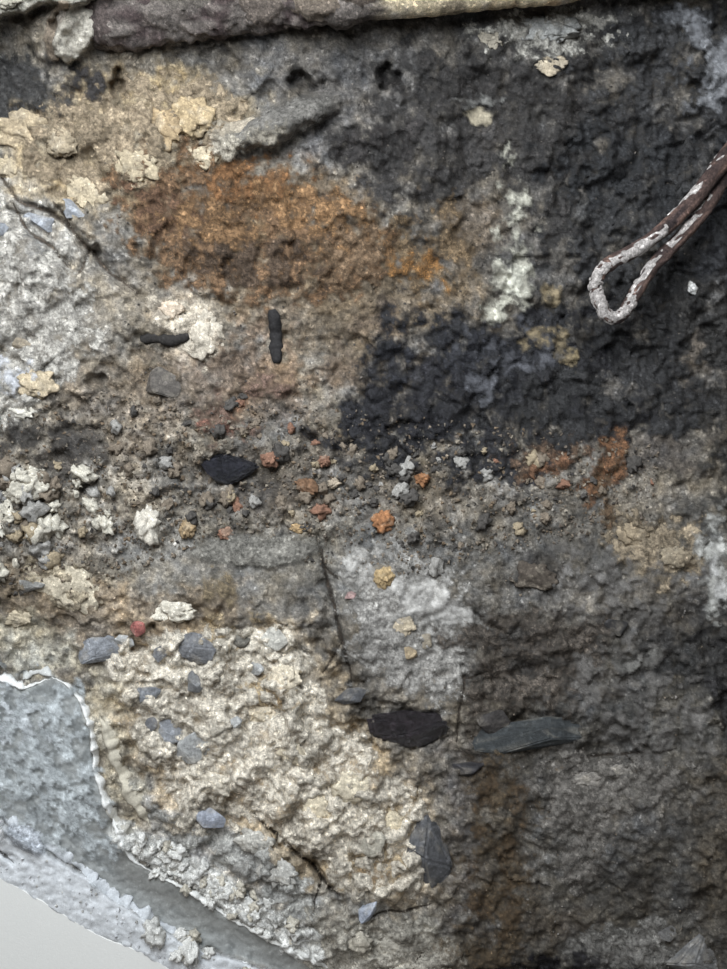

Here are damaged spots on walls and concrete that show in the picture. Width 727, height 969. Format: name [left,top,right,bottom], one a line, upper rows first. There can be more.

peeling [0,0,94,65]
spalling [462,4,629,77]
spalling [0,70,255,435]
rust [102,135,474,313]
peeling [587,181,713,325]
damp [301,0,727,762]
spalling [19,555,104,616]
spalling [331,527,476,716]
spalling [598,504,707,594]
spalling [0,621,468,969]
spalling [520,733,703,905]
spalling [558,915,718,969]